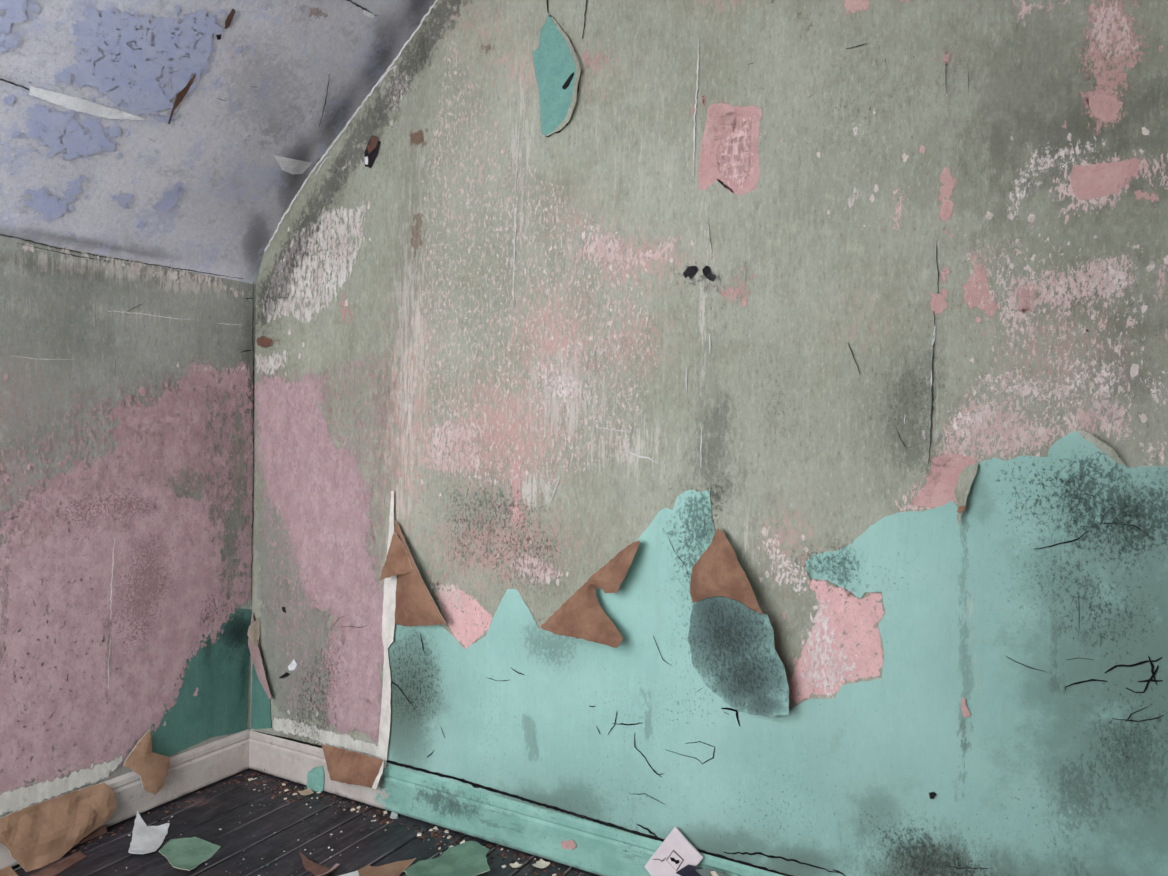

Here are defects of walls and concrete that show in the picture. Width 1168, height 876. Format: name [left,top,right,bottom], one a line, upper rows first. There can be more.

peeling [0,0,238,161]
crack [264,0,438,251]
spalling [332,135,381,178]
peeling [415,32,762,586]
peeling [894,0,1168,512]
crack [0,234,255,606]
peeling [0,201,384,816]
mould [688,596,789,718]
peeling [755,526,884,703]
crack [1006,656,1164,722]
crack [387,728,665,862]
crack [696,848,846,876]